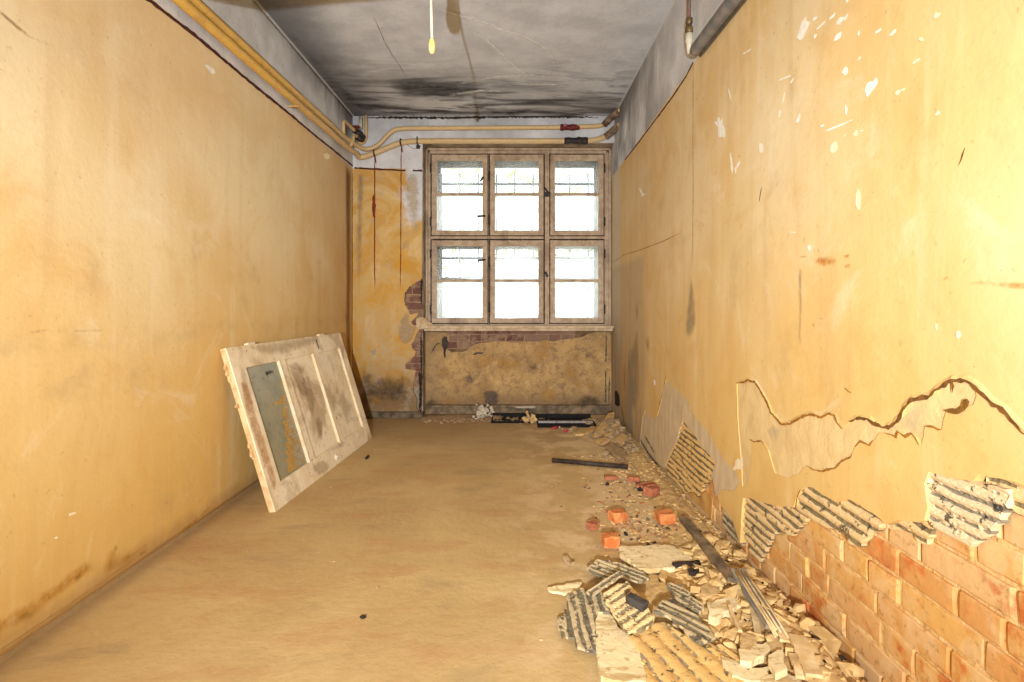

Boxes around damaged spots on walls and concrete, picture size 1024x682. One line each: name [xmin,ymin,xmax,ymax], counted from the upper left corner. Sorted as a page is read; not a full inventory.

peeling [796,0,849,41]
peeling [865,77,878,97]
peeling [714,117,725,138]
peeling [820,105,864,153]
crack [736,374,1024,511]
flaking render [640,380,1024,682]